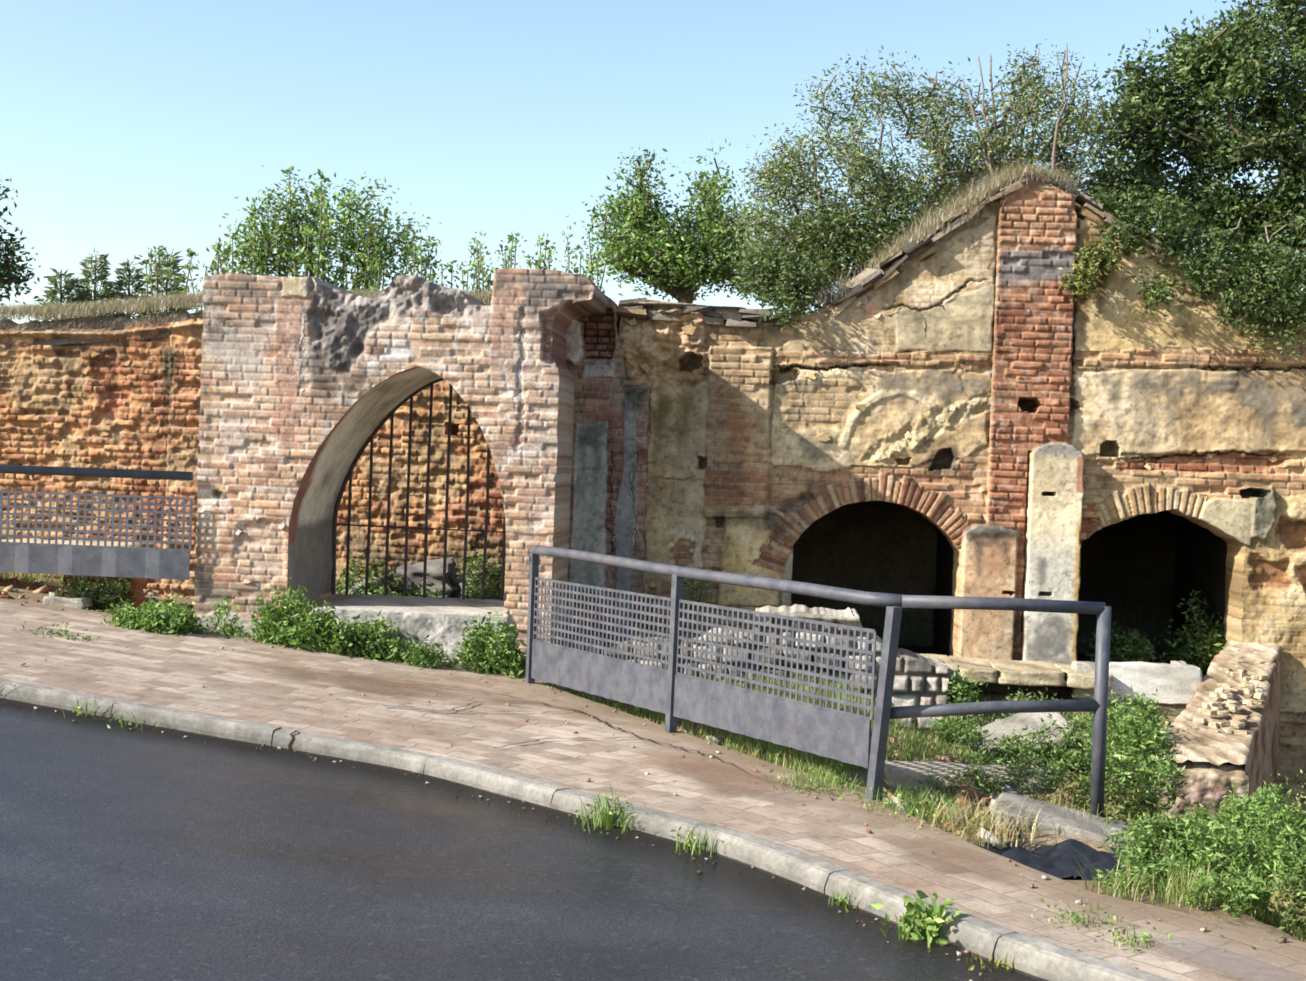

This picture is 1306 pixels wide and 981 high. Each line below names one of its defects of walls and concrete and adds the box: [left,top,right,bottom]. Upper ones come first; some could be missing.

crack [884,280,981,336]
leakage [366,338,413,375]
spalling [539,301,707,391]
spalling [1248,515,1306,594]
crack [288,729,301,750]